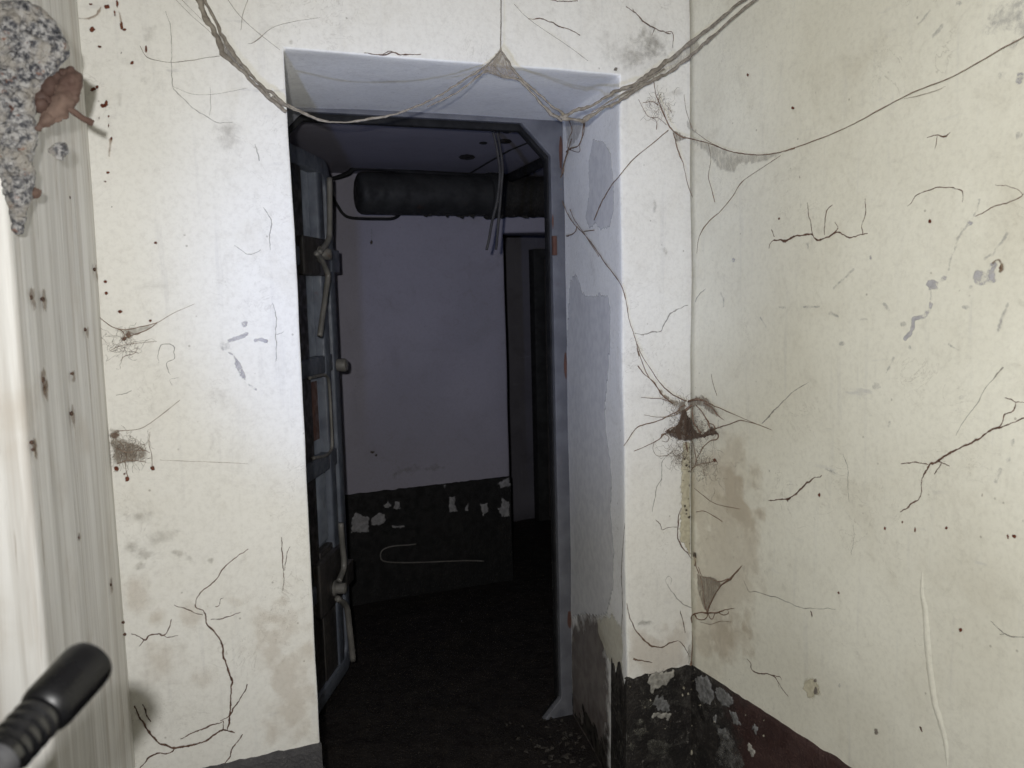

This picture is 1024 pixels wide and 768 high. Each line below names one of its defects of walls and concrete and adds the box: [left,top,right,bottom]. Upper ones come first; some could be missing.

crack [909,187,963,205]
crack [975,185,1023,217]
crack [769,203,868,246]
crack [901,367,1024,512]
peeling [351,501,405,533]
peeling [444,478,511,517]
crack [768,475,822,501]
crack [131,549,248,768]
peeling [630,670,674,756]
peeling [682,675,764,768]